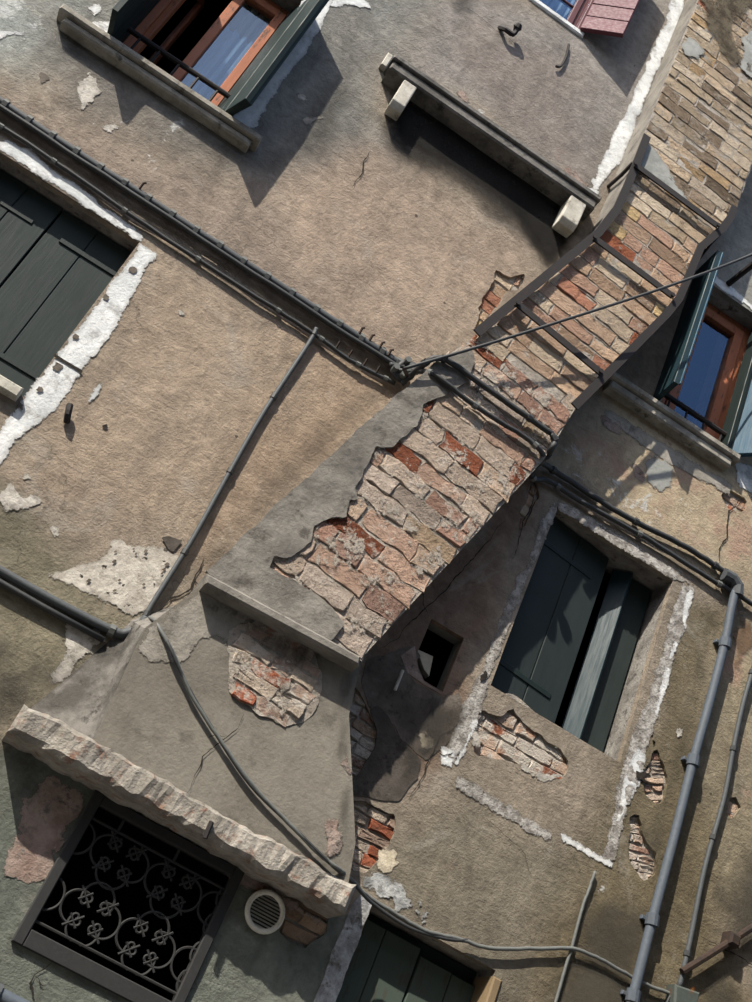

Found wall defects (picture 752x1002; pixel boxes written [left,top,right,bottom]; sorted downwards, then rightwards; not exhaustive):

leakage [702,0,752,71]
spalling [270,0,752,658]
crack [719,499,744,560]
spalling [48,539,179,617]
spalling [227,621,322,728]
spalling [401,646,442,695]
peeling [418,502,695,881]
crack [187,716,243,793]
spalling [349,690,377,777]
spalling [4,774,84,884]
spalling [324,819,343,857]
spalling [351,801,399,873]